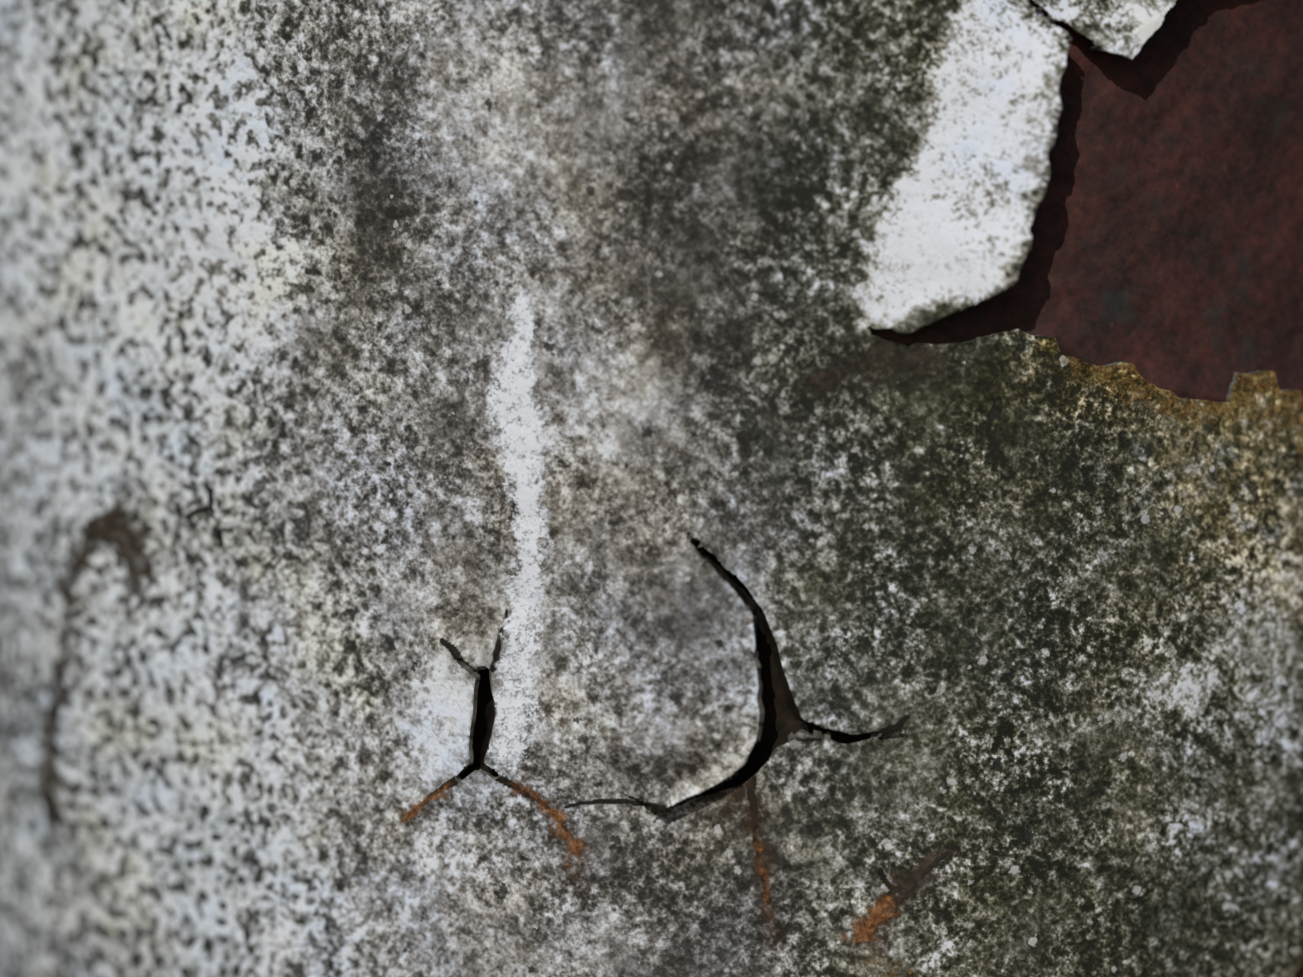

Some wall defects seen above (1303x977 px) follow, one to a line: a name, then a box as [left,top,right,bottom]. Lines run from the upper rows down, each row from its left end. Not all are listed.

peeling [860,0,1303,402]
water stain [485,286,555,776]
crack [405,540,910,903]
corrosion [841,850,958,977]